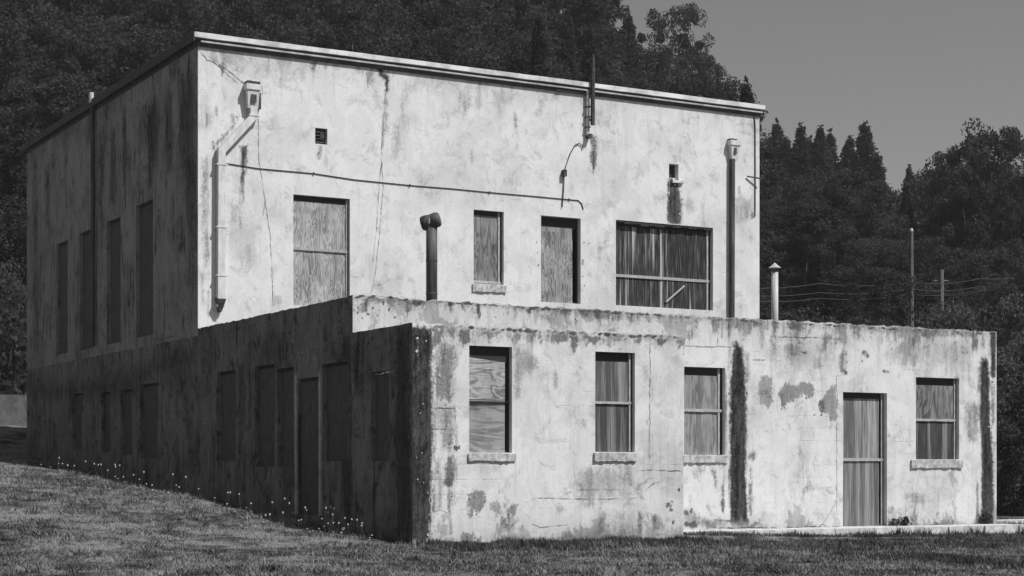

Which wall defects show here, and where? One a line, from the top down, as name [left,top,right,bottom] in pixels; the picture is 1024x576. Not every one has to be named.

water stain [389,326,457,542]
water stain [712,320,762,524]
peeling [758,375,838,430]
water stain [965,331,996,524]